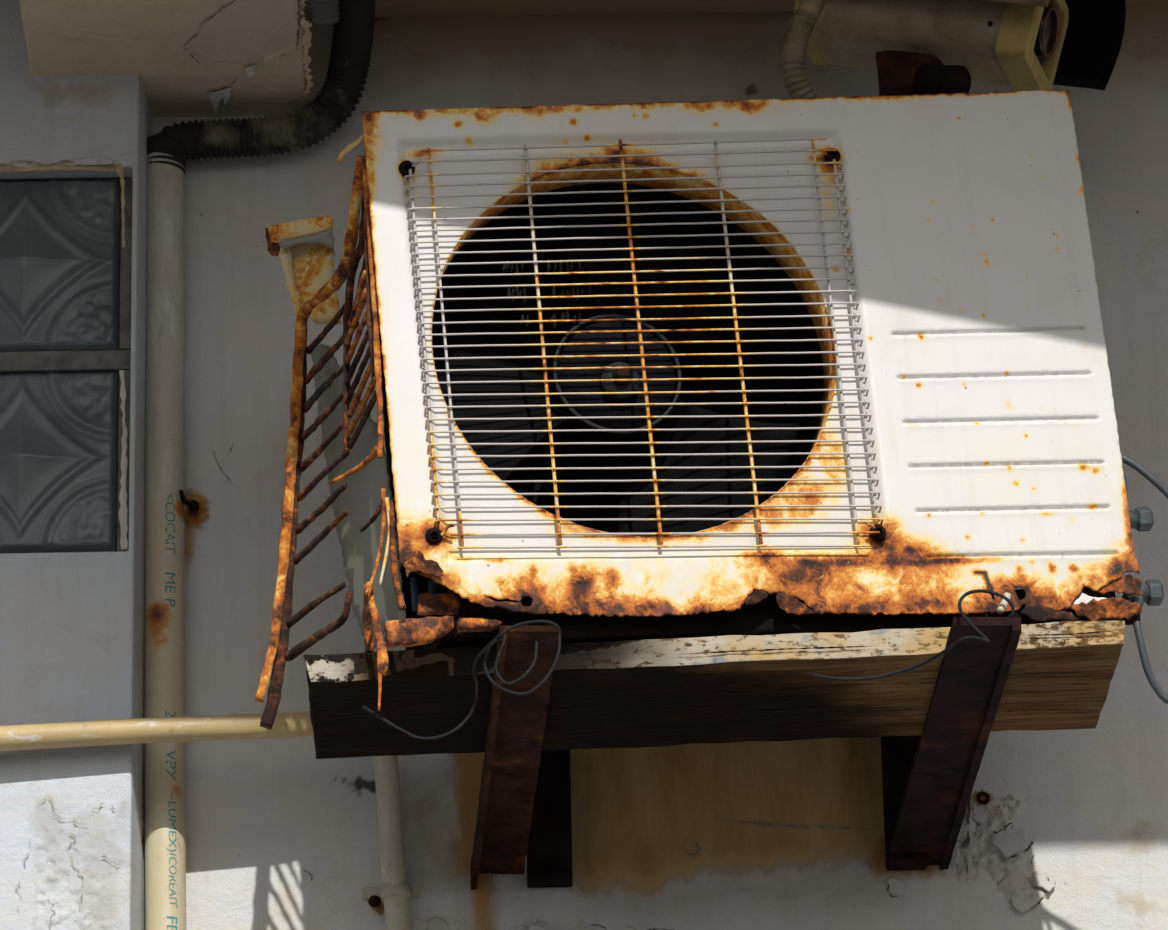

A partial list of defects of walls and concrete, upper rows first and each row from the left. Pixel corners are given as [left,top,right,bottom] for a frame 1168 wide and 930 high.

peeling [184,0,314,119]
damp [570,737,885,895]
flaking render [937,783,1067,913]
crack [590,922,674,930]